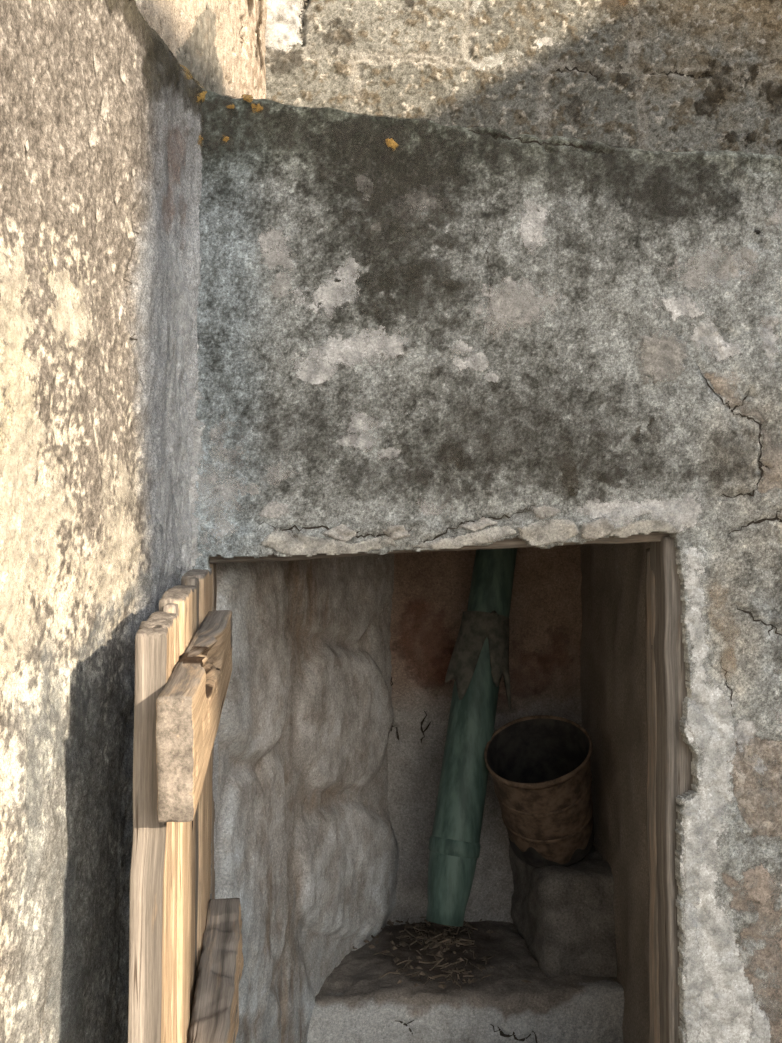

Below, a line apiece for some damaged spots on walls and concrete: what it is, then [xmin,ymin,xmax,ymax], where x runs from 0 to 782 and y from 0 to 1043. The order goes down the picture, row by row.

leakage [258,116,557,385]
leakage [652,257,741,362]
leakage [336,412,401,460]
leakage [631,418,663,443]
crack [698,366,782,534]
spalling [704,372,782,493]
crack [257,522,330,538]
crack [355,505,535,551]
crack [737,607,782,636]
spalling [728,735,782,840]
flaking render [722,863,782,1043]
crack [490,1024,537,1043]